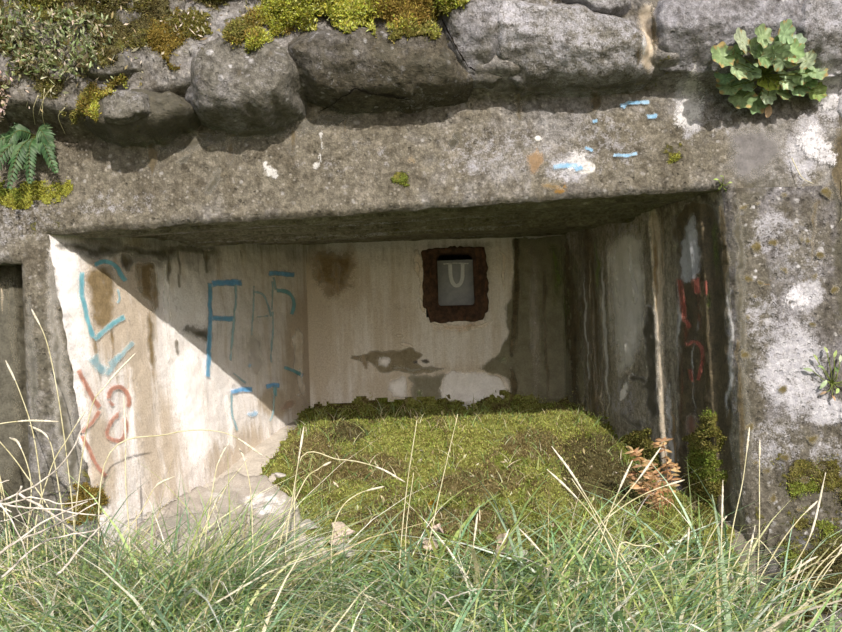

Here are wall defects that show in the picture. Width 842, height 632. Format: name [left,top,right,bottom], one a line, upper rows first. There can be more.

leakage [57,243,218,377]
leakage [313,251,356,297]
spalling [352,234,584,410]
leakage [575,227,608,422]
leakage [611,201,745,527]